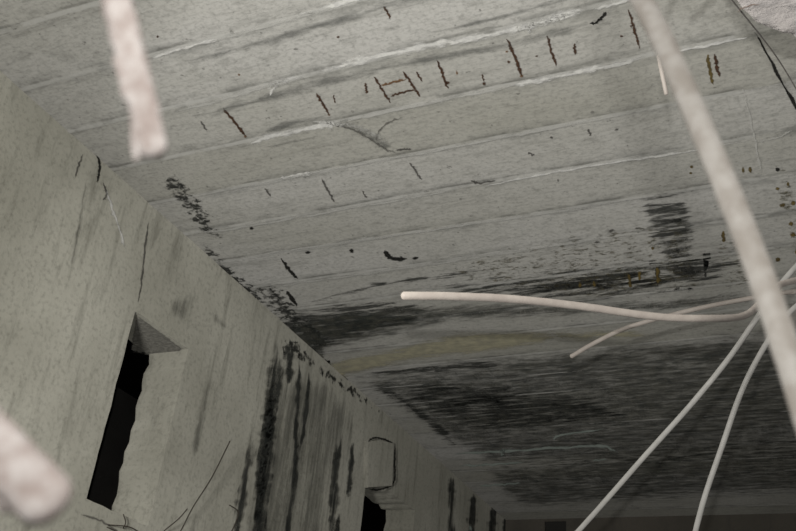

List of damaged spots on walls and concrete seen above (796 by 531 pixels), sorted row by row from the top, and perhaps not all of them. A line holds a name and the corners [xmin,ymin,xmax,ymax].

rust [506,39,523,77]
rust [364,72,422,103]
crack [337,119,411,151]
damp [491,150,697,185]
damp [166,174,443,237]
crack [138,226,148,301]
spalling [132,318,181,355]
damp [206,194,796,531]
crack [369,437,396,491]